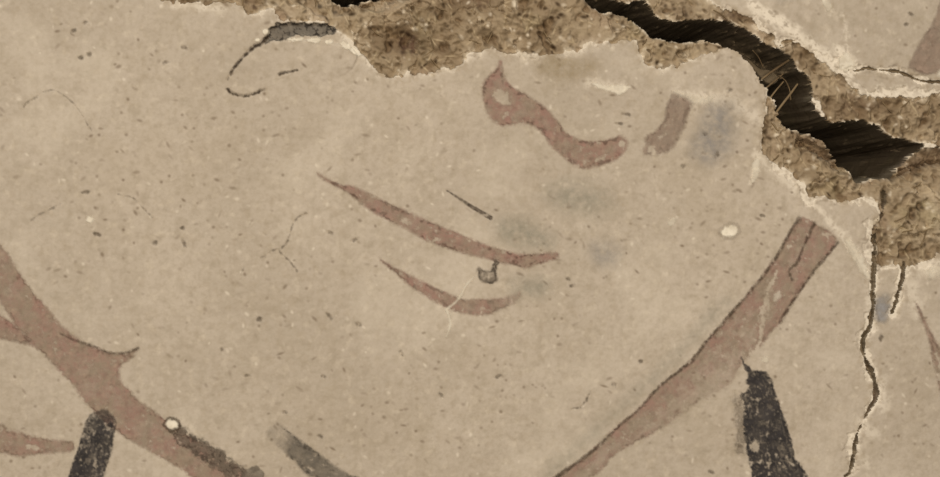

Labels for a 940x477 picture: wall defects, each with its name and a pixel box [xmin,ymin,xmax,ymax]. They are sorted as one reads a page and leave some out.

crack [331,0,379,8]
flaking render [161,0,725,78]
flaking render [593,83,630,95]
flaking render [615,0,940,278]
crack [585,0,940,477]